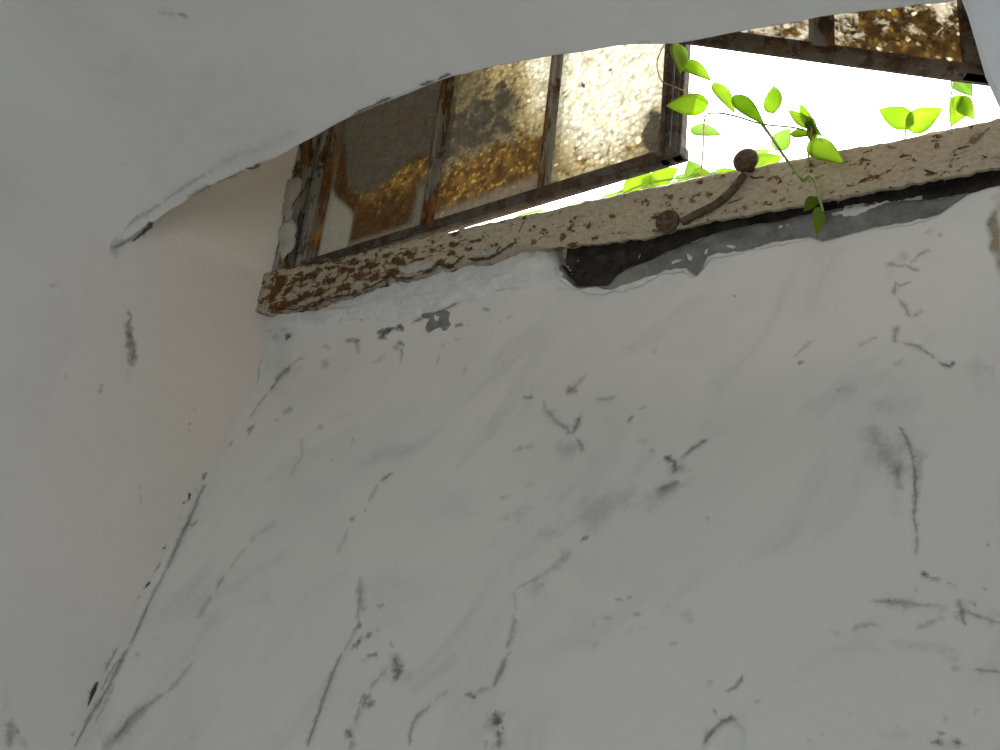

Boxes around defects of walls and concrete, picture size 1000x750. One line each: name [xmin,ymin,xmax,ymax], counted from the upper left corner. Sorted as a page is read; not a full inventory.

peeling [278,160,309,258]
corrosion [552,222,599,253]
spalling [555,170,1000,295]
corrosion [268,238,499,313]
spalling [422,310,463,333]